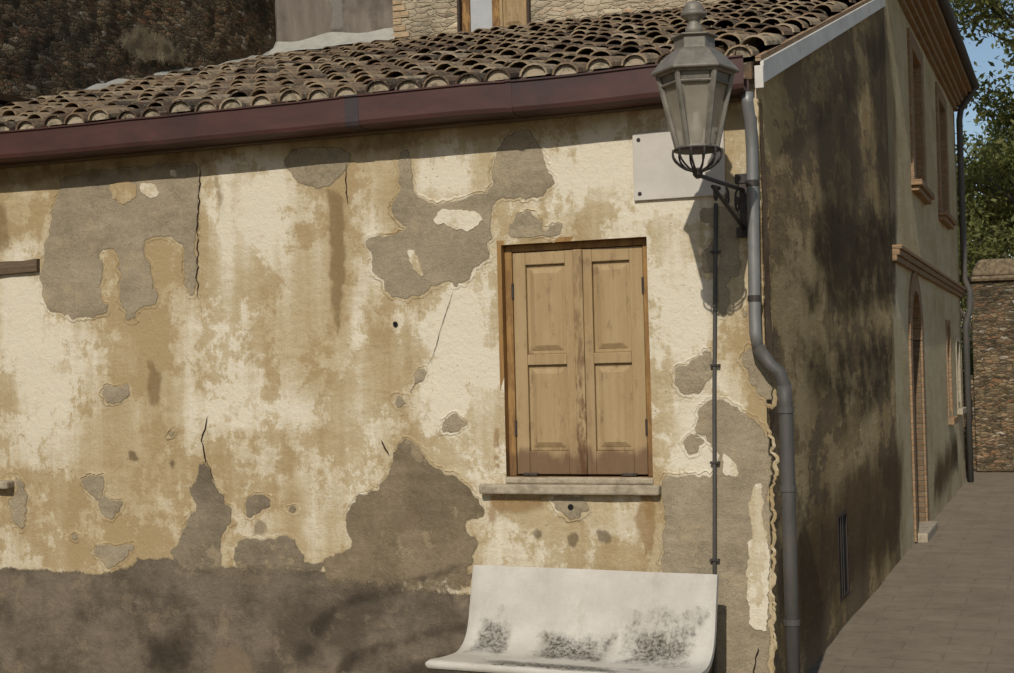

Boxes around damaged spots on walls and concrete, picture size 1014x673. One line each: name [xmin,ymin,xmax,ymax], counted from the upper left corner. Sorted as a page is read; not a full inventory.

peeling [37,159,204,325]
peeling [284,147,351,189]
peeling [362,124,565,304]
peeling [696,202,749,322]
spalling [757,98,773,357]
damp [814,208,896,314]
peeling [170,435,489,600]
peeling [655,341,780,673]